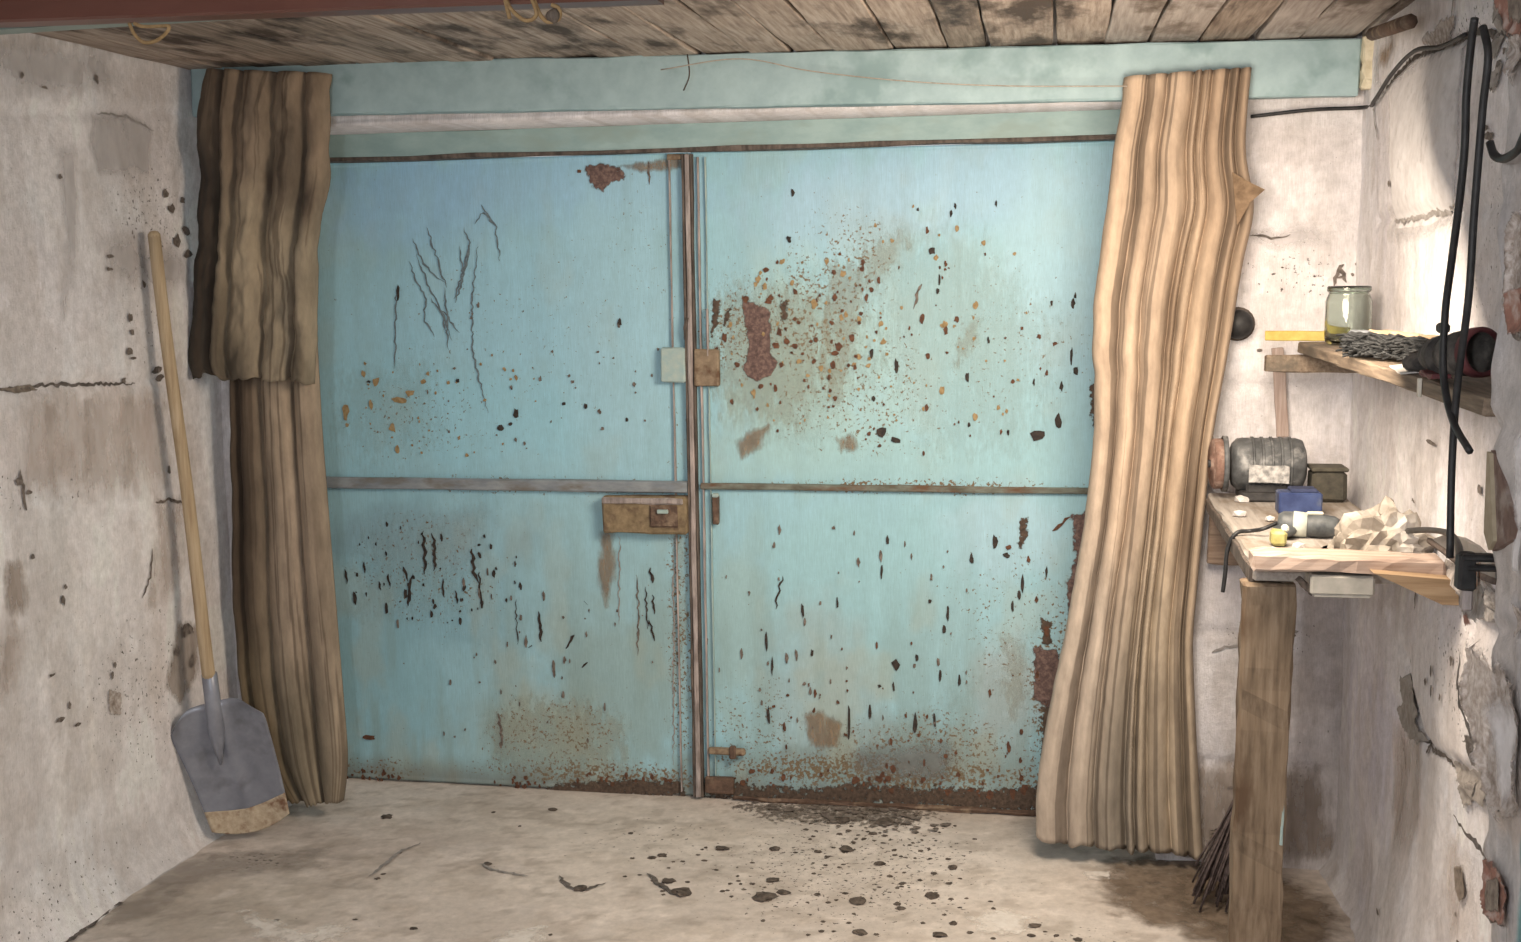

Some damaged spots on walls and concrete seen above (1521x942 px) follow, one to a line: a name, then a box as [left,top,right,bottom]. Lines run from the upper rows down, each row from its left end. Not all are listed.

crack [1373,0,1512,137]
flaking render [1489,0,1521,92]
corrosion [577,160,681,192]
crack [0,381,135,393]
corrosion [710,252,979,457]
corrosion [383,534,528,664]
corrosion [1006,518,1030,563]
corrosion [1052,511,1085,611]
corrosion [347,769,401,781]
corrosion [494,533,685,797]
corrosion [708,596,1059,810]
spalling [1397,562,1519,942]